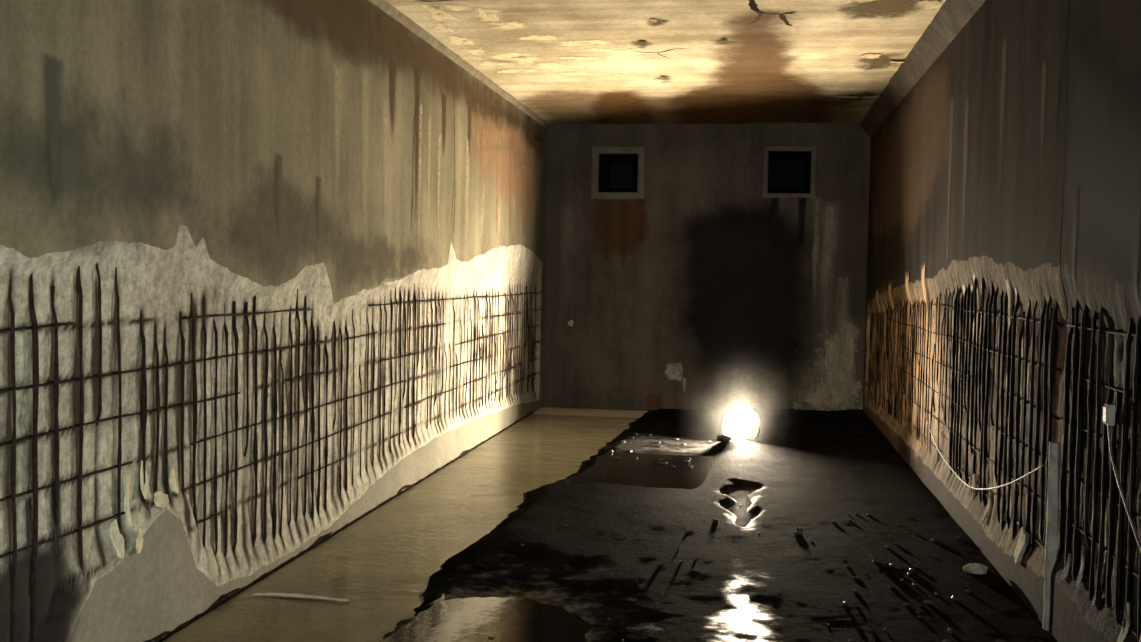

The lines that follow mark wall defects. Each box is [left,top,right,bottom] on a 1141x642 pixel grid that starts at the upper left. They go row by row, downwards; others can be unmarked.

water stain [3,59,184,213]
crack [748,0,797,26]
spalling [860,53,905,70]
spalling [0,225,542,642]
spalling [865,255,1141,642]